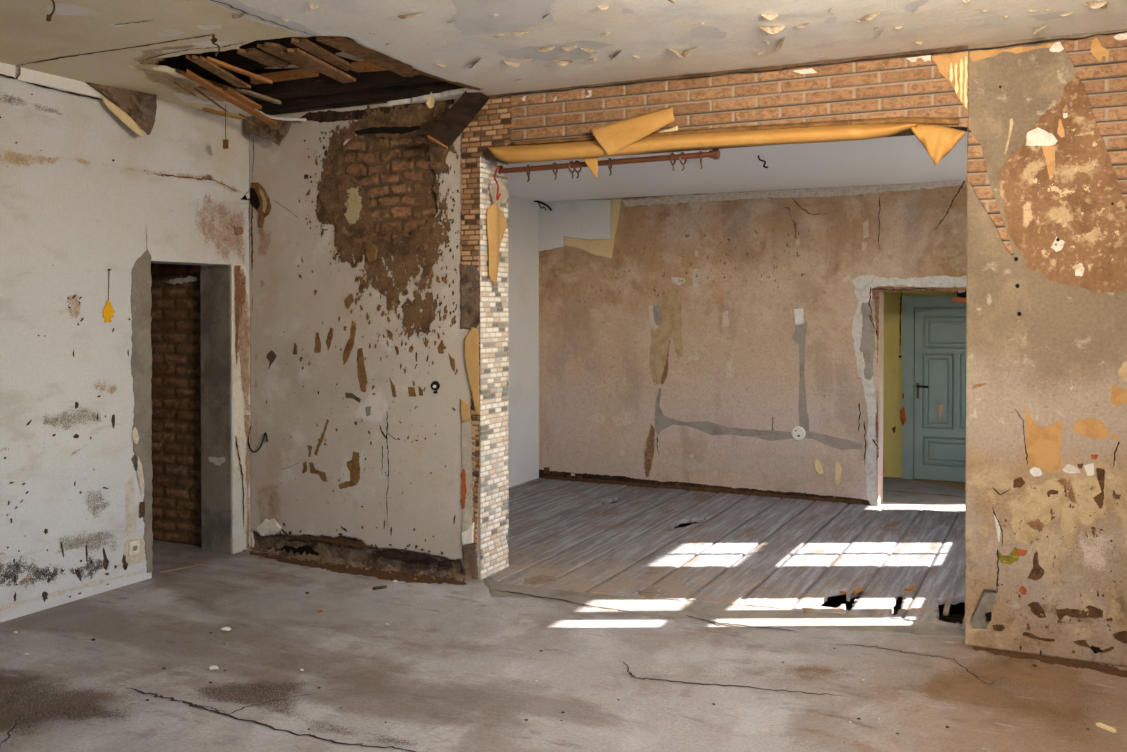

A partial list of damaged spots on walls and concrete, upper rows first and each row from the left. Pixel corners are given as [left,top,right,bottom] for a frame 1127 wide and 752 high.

peeling [137,0,322,54]
peeling [447,0,621,81]
peeling [998,72,1127,293]
spalling [266,99,459,504]
spalling [868,286,967,368]
spalling [231,262,463,575]
spalling [858,393,907,467]
water stain [0,530,118,588]
peeling [971,463,1127,655]
water stain [0,661,149,745]
crack [131,688,416,752]
water stain [180,676,420,751]